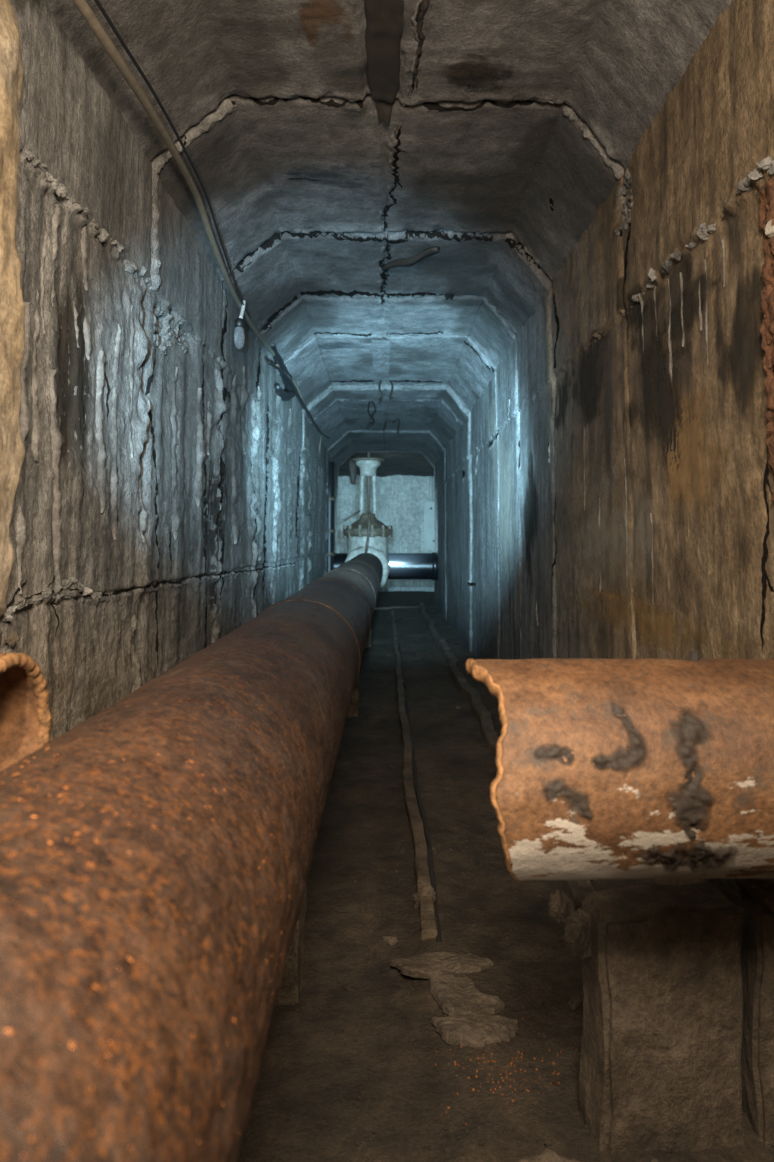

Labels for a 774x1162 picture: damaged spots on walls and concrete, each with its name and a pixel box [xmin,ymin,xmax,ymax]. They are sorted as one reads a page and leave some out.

spalling [23,150,152,286]
spalling [152,305,197,355]
crack [7,0,559,665]
damp [554,331,604,510]
damp [617,239,763,467]
spalling [0,597,26,646]
spalling [41,577,102,603]
crack [760,445,774,649]